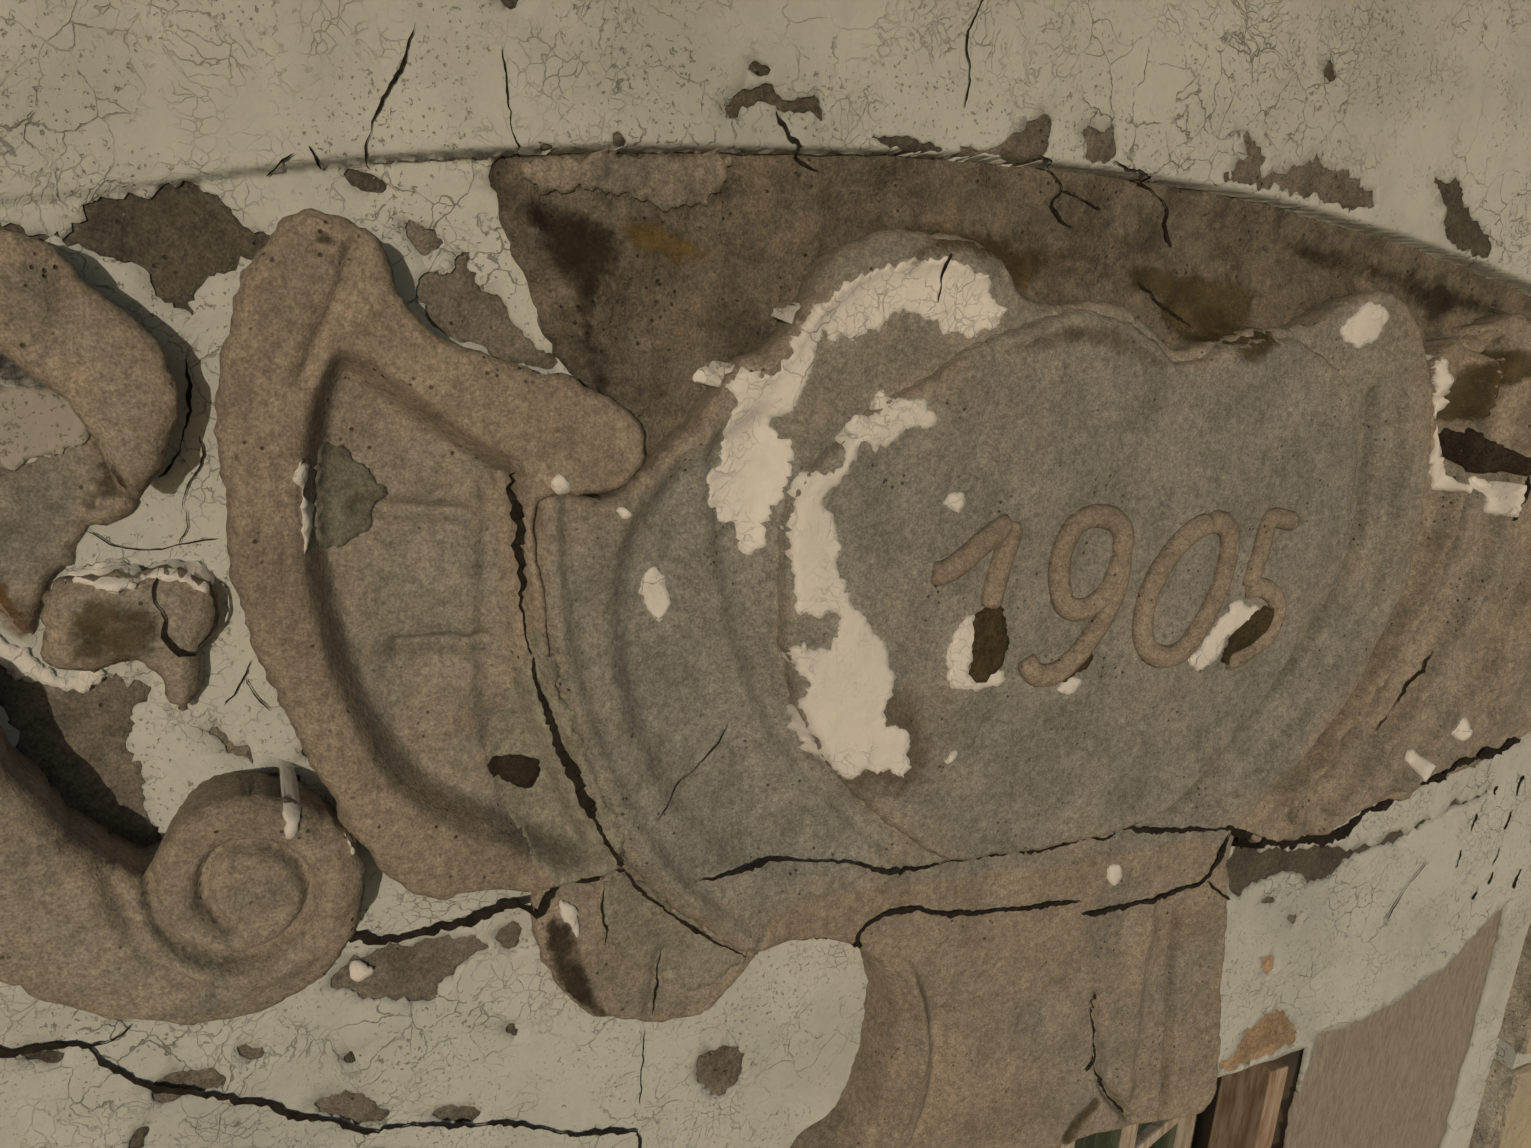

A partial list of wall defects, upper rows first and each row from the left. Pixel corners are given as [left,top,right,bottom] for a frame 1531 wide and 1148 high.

crack [364,24,415,170]
crack [502,47,520,157]
crack [776,111,818,171]
crack [965,0,983,105]
peeling [0,181,270,316]
spalling [1426,354,1531,517]
peeling [693,256,1010,779]
spalling [0,636,162,846]
crack [0,473,749,1148]
peeling [484,628,748,991]
crack [696,737,1521,948]
spalling [331,920,522,1001]